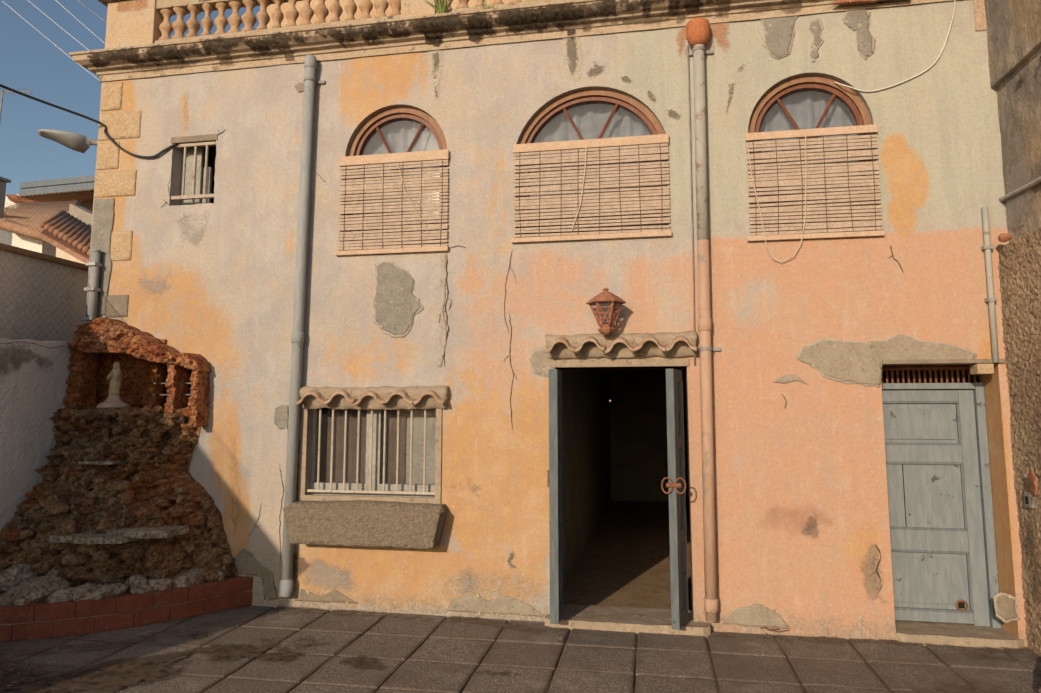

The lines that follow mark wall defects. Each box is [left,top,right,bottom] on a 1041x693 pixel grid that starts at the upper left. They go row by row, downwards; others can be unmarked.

leakage [87,0,814,98]
crack [439,245,466,366]
leakage [0,345,52,375]
crack [504,250,517,429]
spalling [234,548,278,601]
spalling [294,589,357,604]
spalling [722,603,791,629]